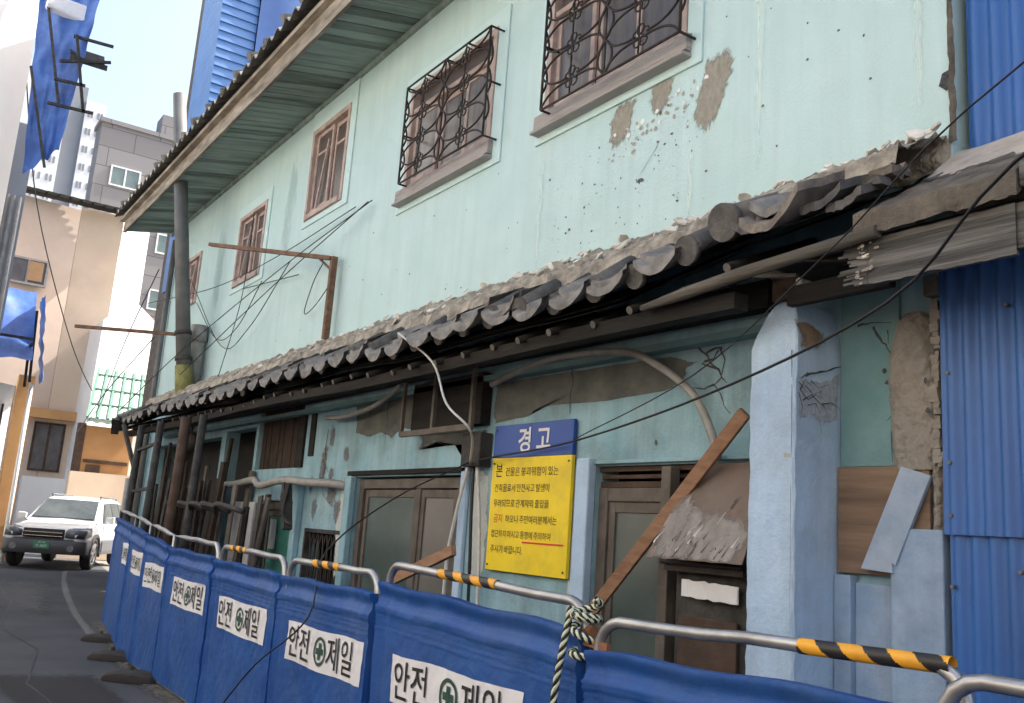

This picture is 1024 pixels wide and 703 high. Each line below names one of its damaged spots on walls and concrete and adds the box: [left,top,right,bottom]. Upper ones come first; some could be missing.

spalling [145,75,951,406]
crack [857,322,891,353]
peeling [356,397,414,438]
peeling [494,357,694,423]
crack [692,346,730,413]
crack [791,350,841,451]
peeling [334,479,344,576]